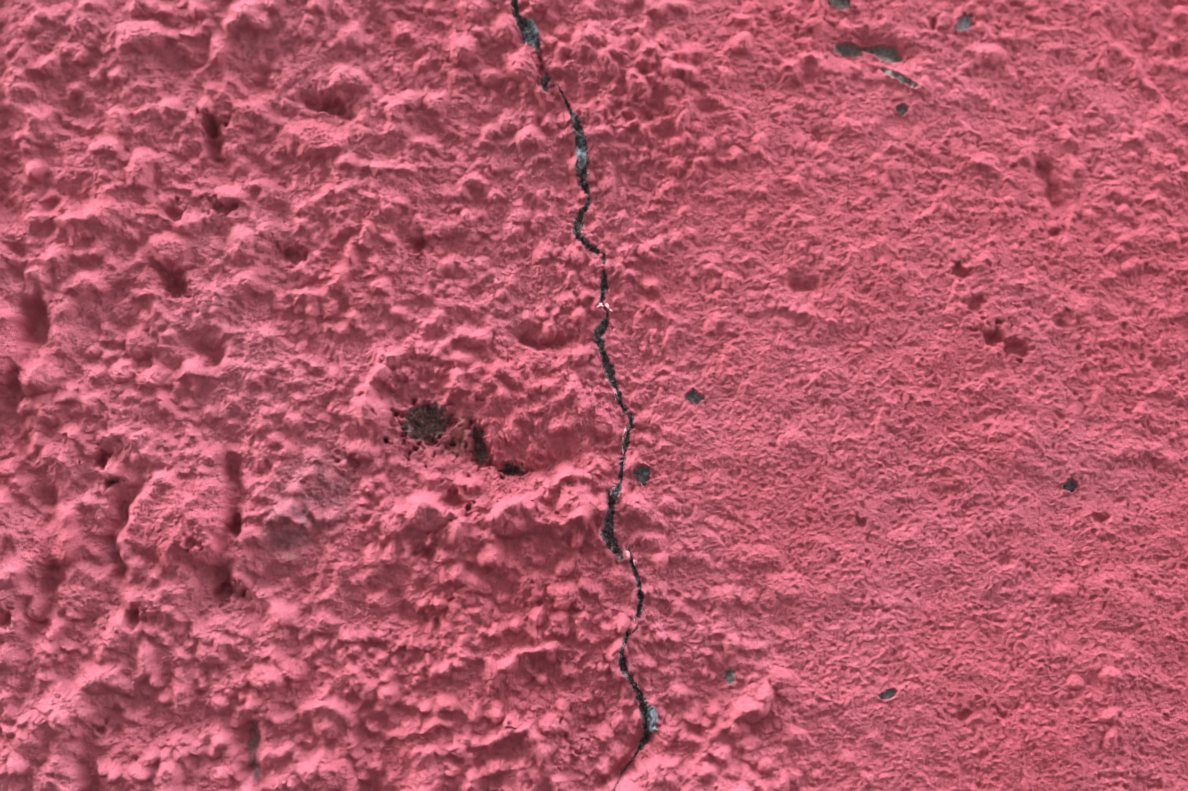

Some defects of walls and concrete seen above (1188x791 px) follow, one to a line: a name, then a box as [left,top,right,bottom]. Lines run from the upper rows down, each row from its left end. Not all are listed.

crack [511,0,658,791]